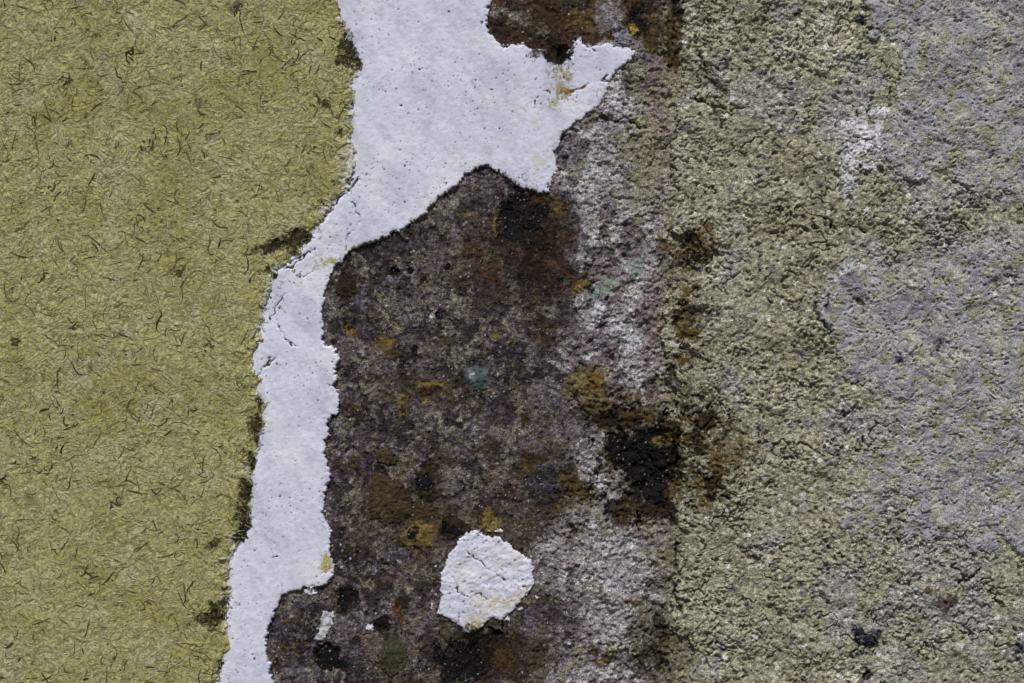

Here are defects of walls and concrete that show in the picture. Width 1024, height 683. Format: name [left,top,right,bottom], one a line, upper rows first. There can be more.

spalling [486,0,673,62]
damp [490,127,614,287]
damp [602,214,646,275]
damp [590,285,650,357]
spalling [266,165,597,683]
damp [517,402,635,520]
damp [631,371,644,395]
damp [575,448,686,604]